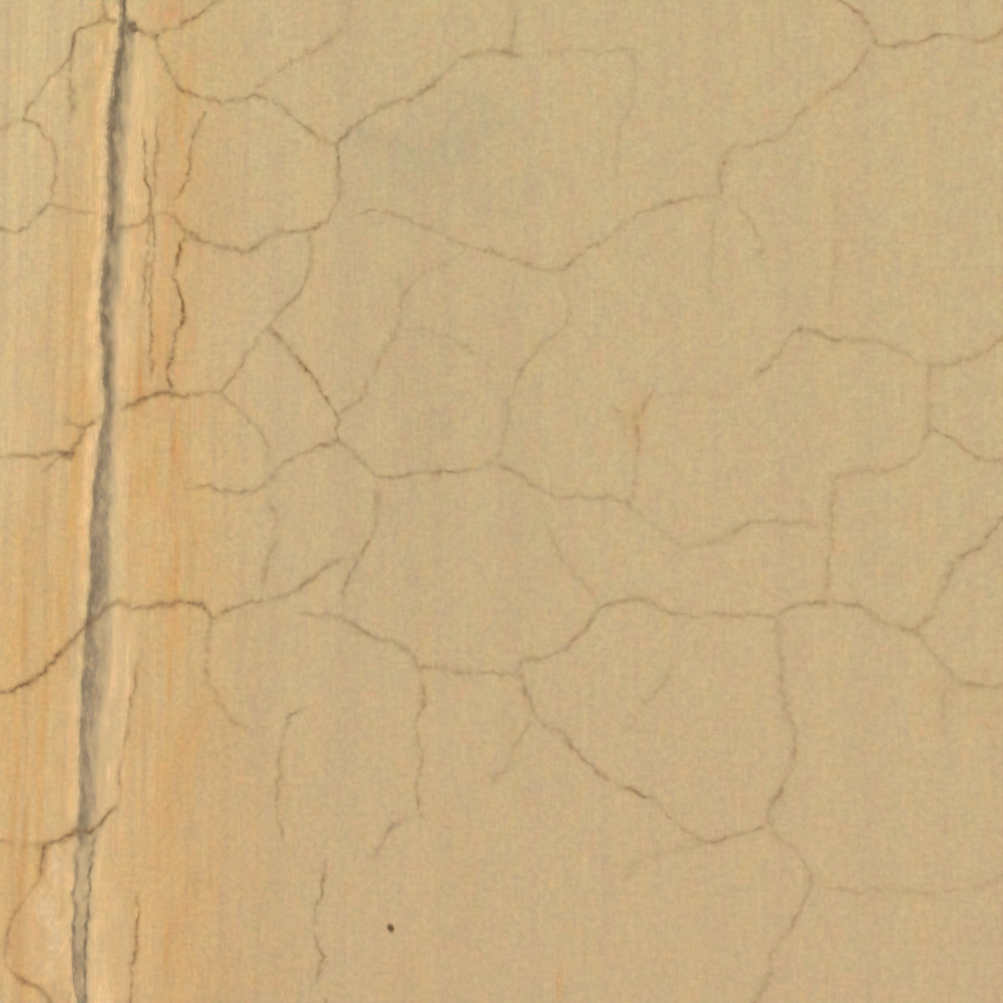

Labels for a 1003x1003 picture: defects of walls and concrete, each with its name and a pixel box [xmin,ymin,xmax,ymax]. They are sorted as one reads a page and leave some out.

crack [66,0,132,839]
crack [72,867,91,999]